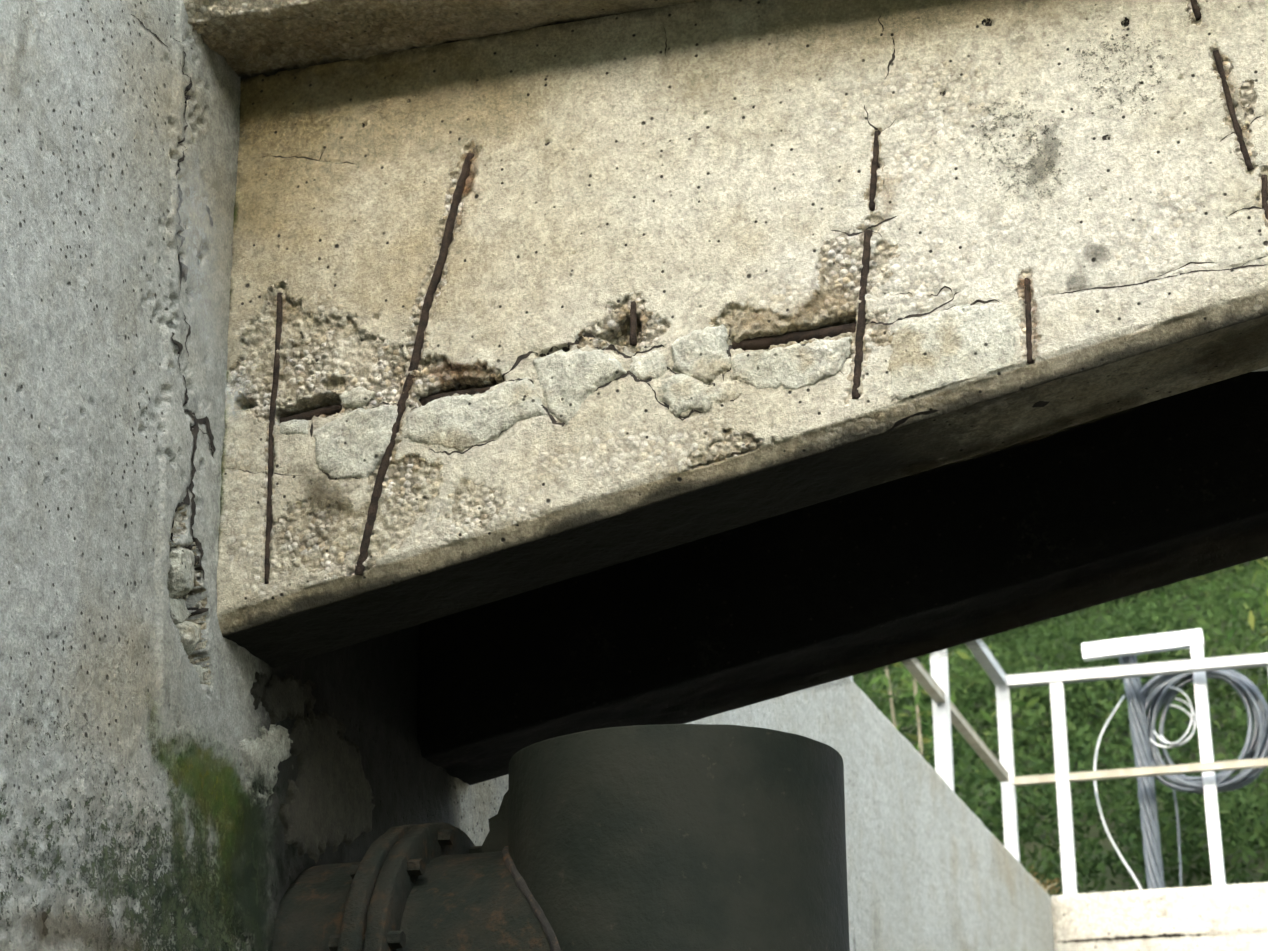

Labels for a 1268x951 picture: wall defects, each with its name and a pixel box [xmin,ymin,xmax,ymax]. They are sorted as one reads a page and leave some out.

crack [131,14,360,617]
crack [430,429,508,455]
crack [459,329,739,427]
spalling [227,128,1042,588]
spalling [167,502,212,689]
damp [72,798,250,951]